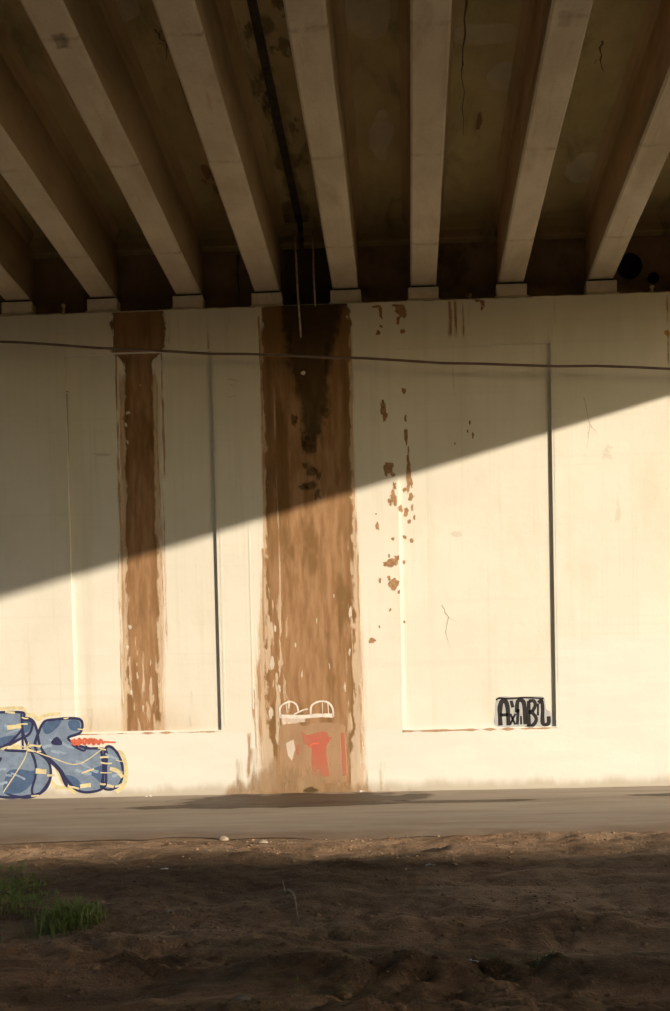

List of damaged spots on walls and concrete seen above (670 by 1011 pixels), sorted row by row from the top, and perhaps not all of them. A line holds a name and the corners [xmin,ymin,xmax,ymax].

crack [154,29,201,145]
rust [110,311,172,734]
rust [248,304,362,791]